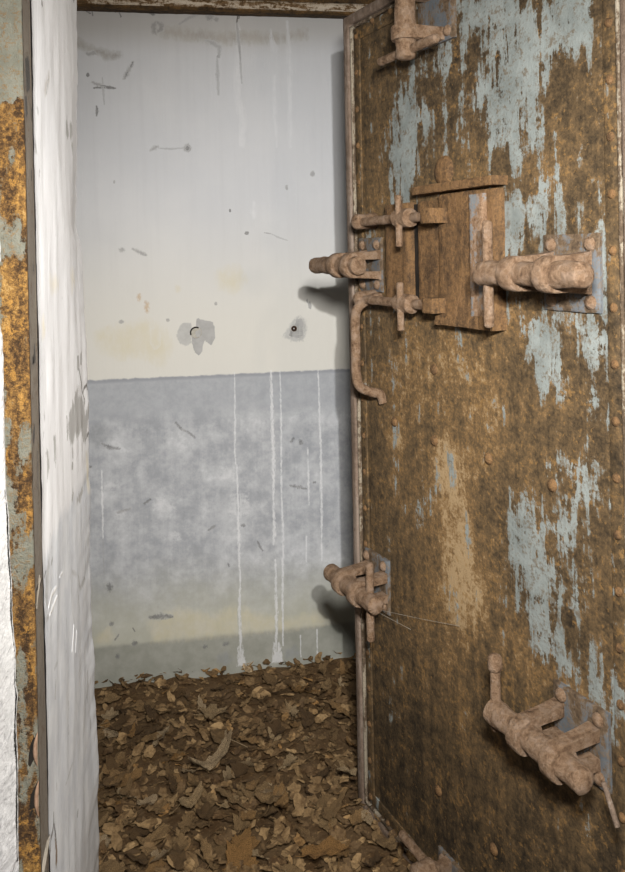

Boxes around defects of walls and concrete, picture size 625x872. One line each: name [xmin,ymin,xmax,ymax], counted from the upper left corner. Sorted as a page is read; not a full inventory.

peeling [165,316,217,357]
peeling [281,314,309,344]
water stain [130,370,333,668]
crack [0,489,19,861]